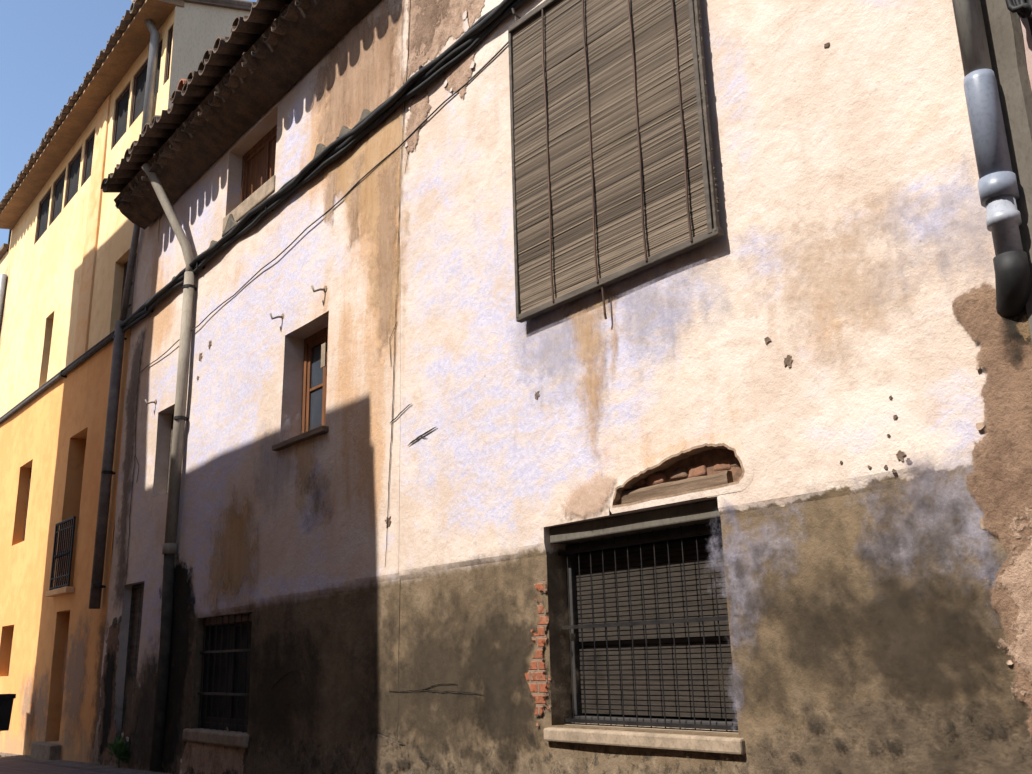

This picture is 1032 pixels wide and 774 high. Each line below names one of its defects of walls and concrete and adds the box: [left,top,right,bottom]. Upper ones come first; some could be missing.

damp [311,0,403,146]
peeling [405,87,430,155]
peeling [402,0,484,84]
peeling [443,50,475,99]
damp [323,106,403,350]
damp [129,556,195,773]
damp [368,602,536,771]
spalling [525,579,552,726]
spalling [563,433,754,517]
damp [730,482,997,696]
peeling [728,283,1032,774]